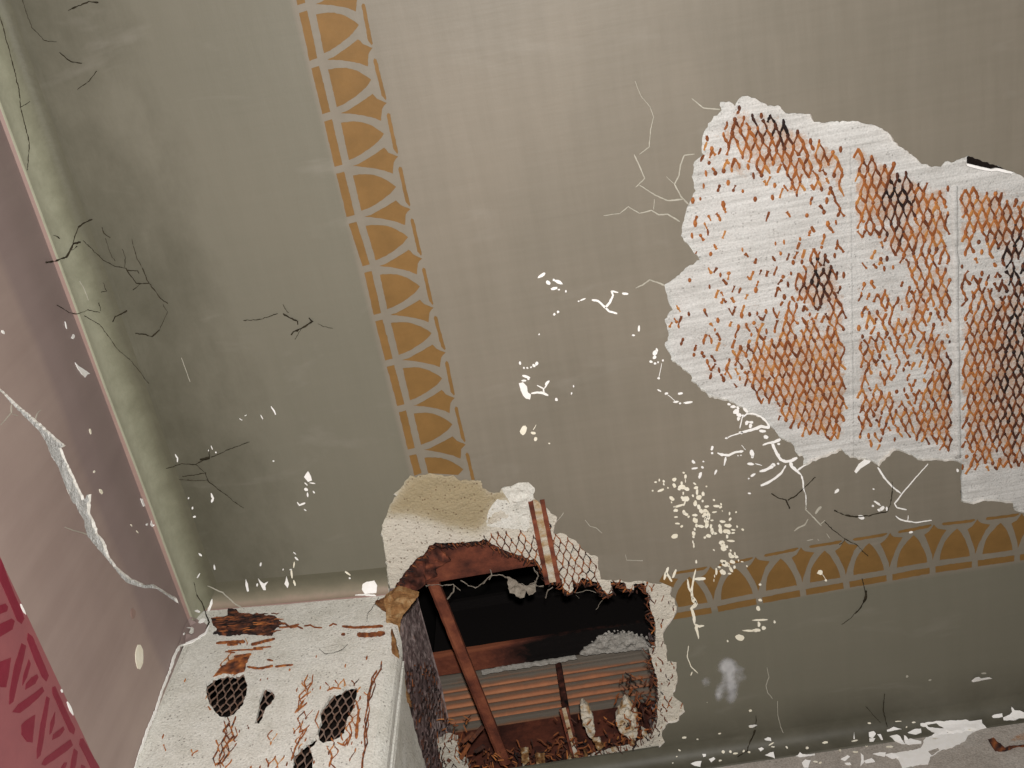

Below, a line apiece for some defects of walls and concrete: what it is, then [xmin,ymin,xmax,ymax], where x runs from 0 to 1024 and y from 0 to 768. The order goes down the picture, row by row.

crack [604,82,694,222]
spalling [649,96,1024,511]
crack [0,391,176,602]
crack [692,403,932,541]
corrosion [396,544,451,591]
corrosion [211,608,385,677]
corrosion [212,716,238,768]
spalling [257,691,275,724]
corrosion [291,674,319,761]
spalling [293,689,357,768]
peeling [691,737,828,768]
peeling [839,707,1024,768]